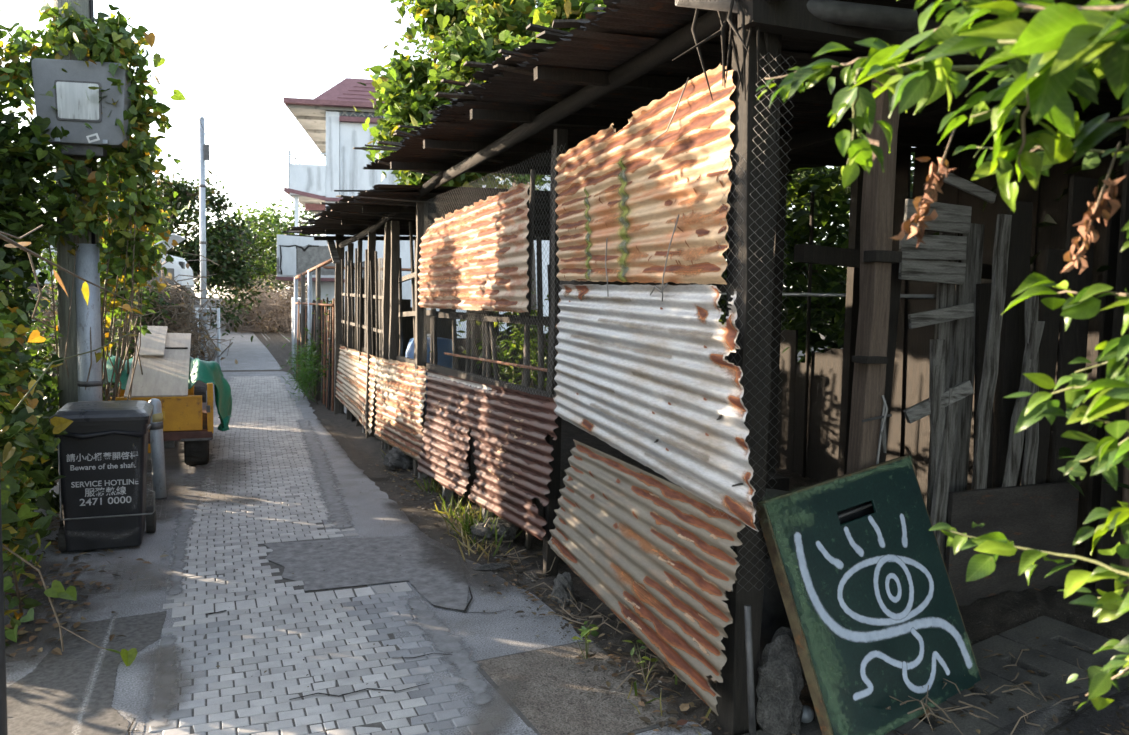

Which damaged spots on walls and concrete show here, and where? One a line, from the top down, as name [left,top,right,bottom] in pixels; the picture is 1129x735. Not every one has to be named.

rust [418,186,525,311]
rust [557,71,734,306]
rust [336,346,557,518]
rust [696,286,746,416]
crack [431,586,504,613]
rust [551,445,756,703]